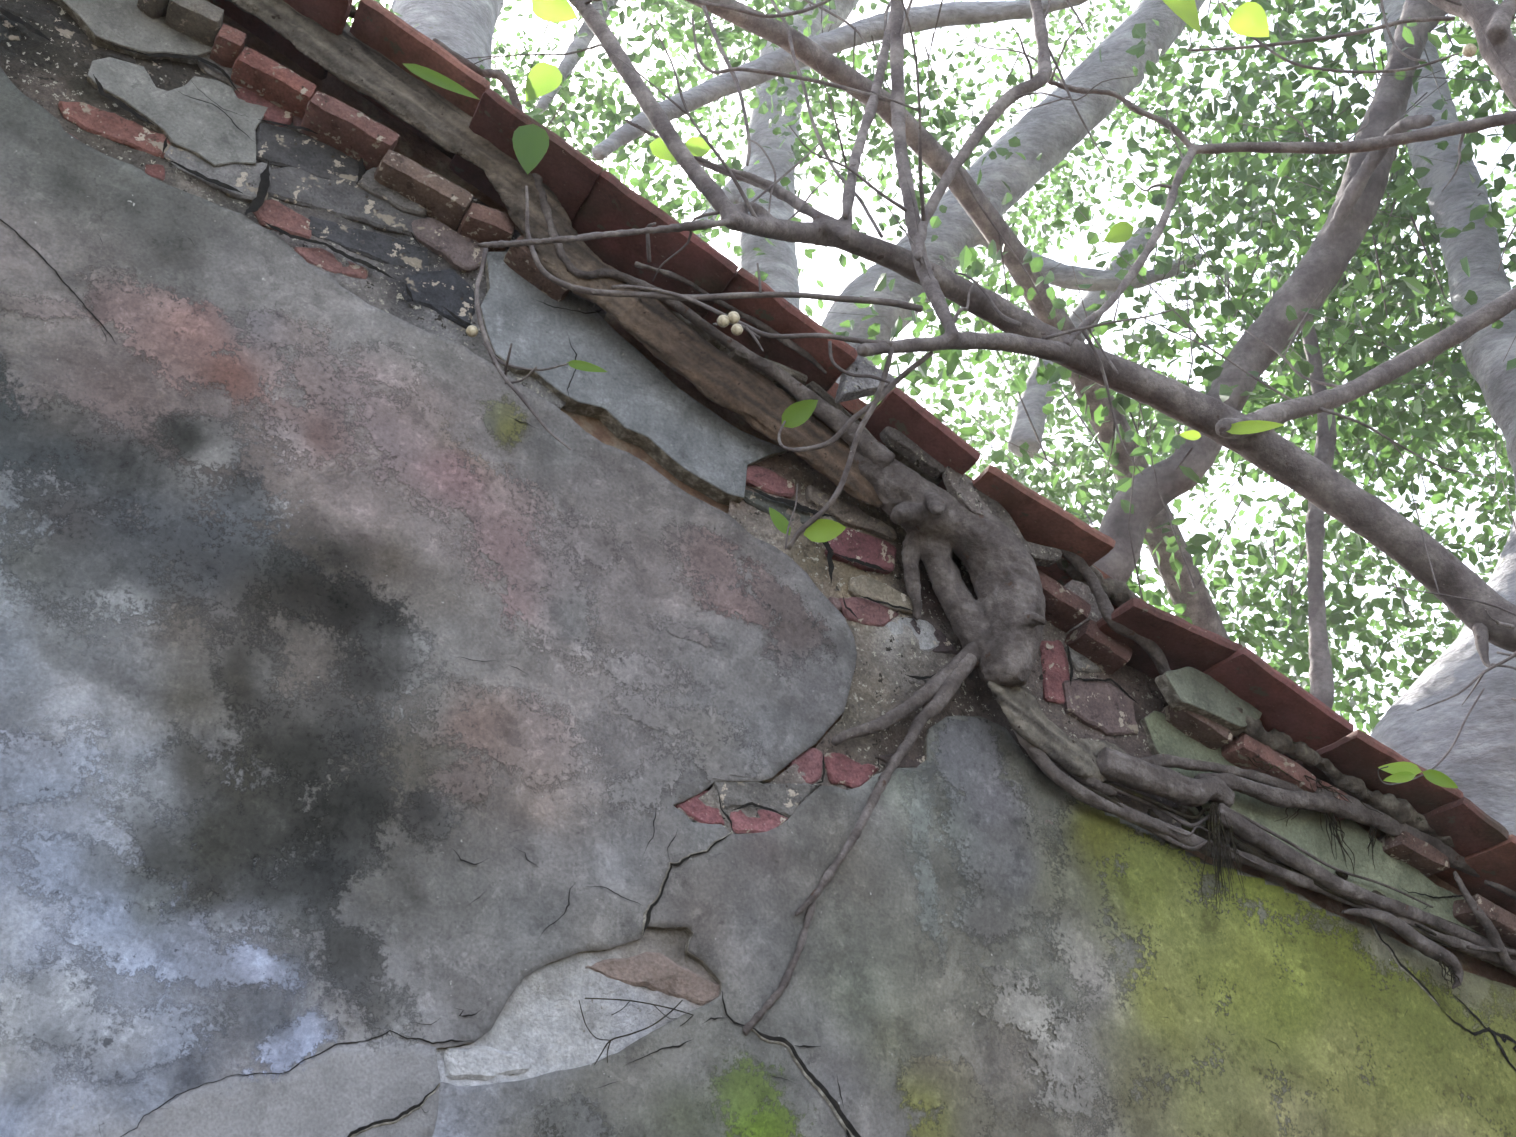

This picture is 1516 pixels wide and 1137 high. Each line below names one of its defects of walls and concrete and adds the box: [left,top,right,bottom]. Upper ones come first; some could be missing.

spalling [0,0,566,409]
spalling [835,344,895,403]
damp [0,263,767,1091]
damp [643,518,837,687]
spalling [675,426,1081,834]
spalling [1025,580,1262,758]
crack [455,829,536,906]
crack [539,798,732,938]
spalling [1105,780,1206,828]
crack [99,1008,483,1137]
spalling [436,929,720,1086]
crack [595,992,861,1137]